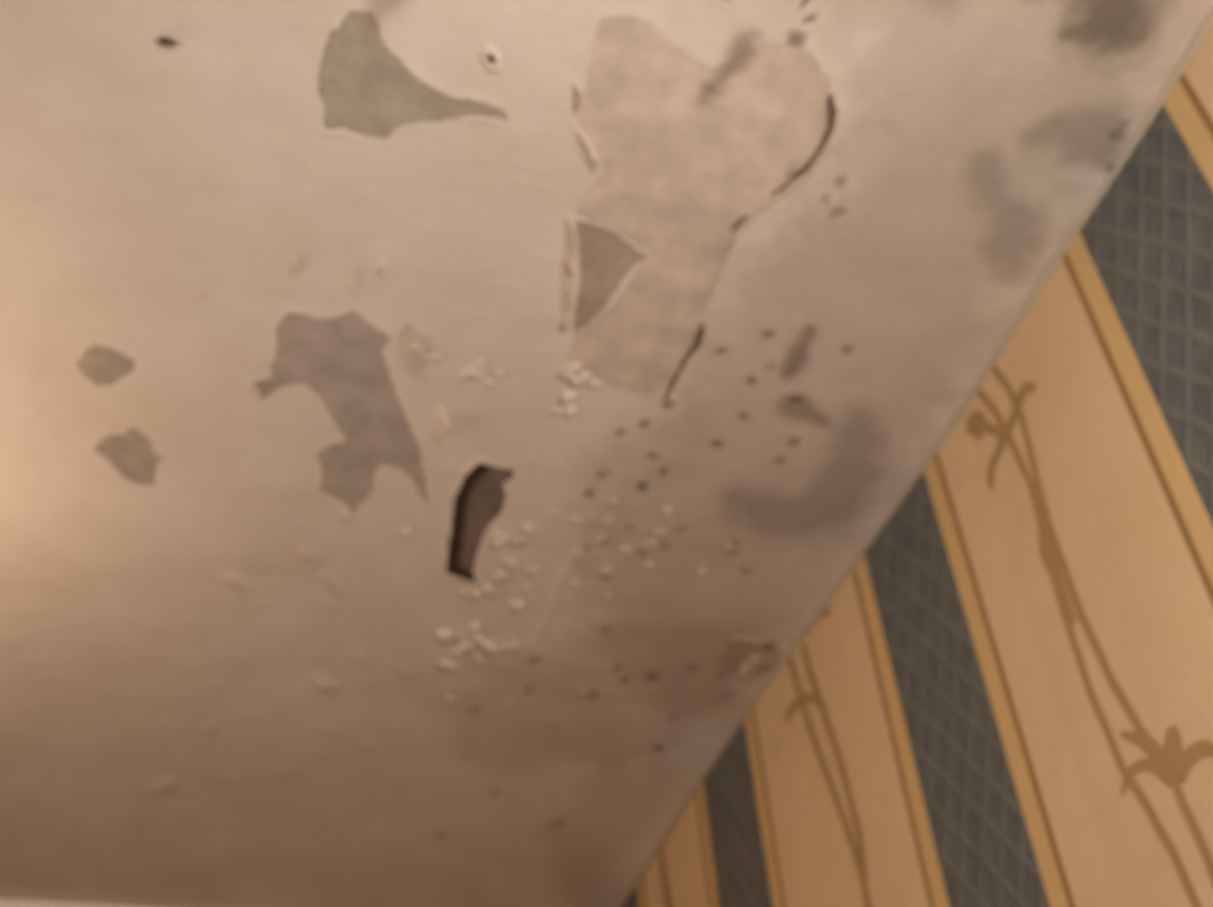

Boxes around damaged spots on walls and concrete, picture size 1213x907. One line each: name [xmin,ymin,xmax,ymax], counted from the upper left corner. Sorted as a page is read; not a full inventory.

peeling [308,1,520,148]
peeling [550,3,849,418]
peeling [68,339,140,389]
peeling [87,423,171,488]
peeling [237,304,523,587]